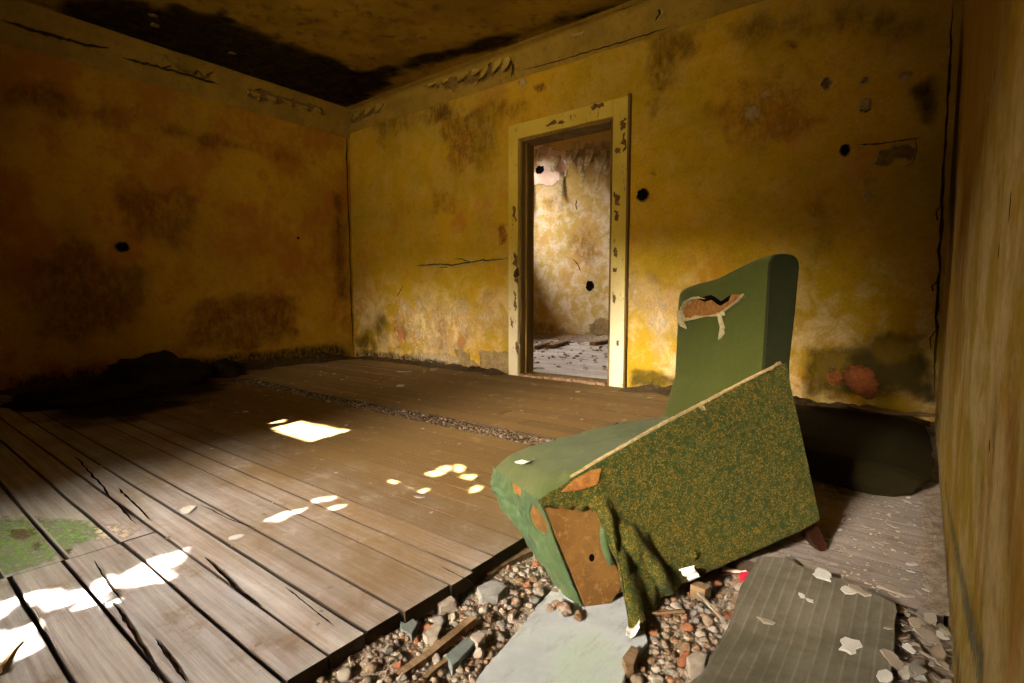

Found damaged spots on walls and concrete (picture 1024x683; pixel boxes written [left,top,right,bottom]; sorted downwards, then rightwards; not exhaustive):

peeling [427,56,513,92]
peeling [534,117,627,203]
crack [929,7,953,395]
crack [397,258,507,296]
leakage [805,331,937,401]